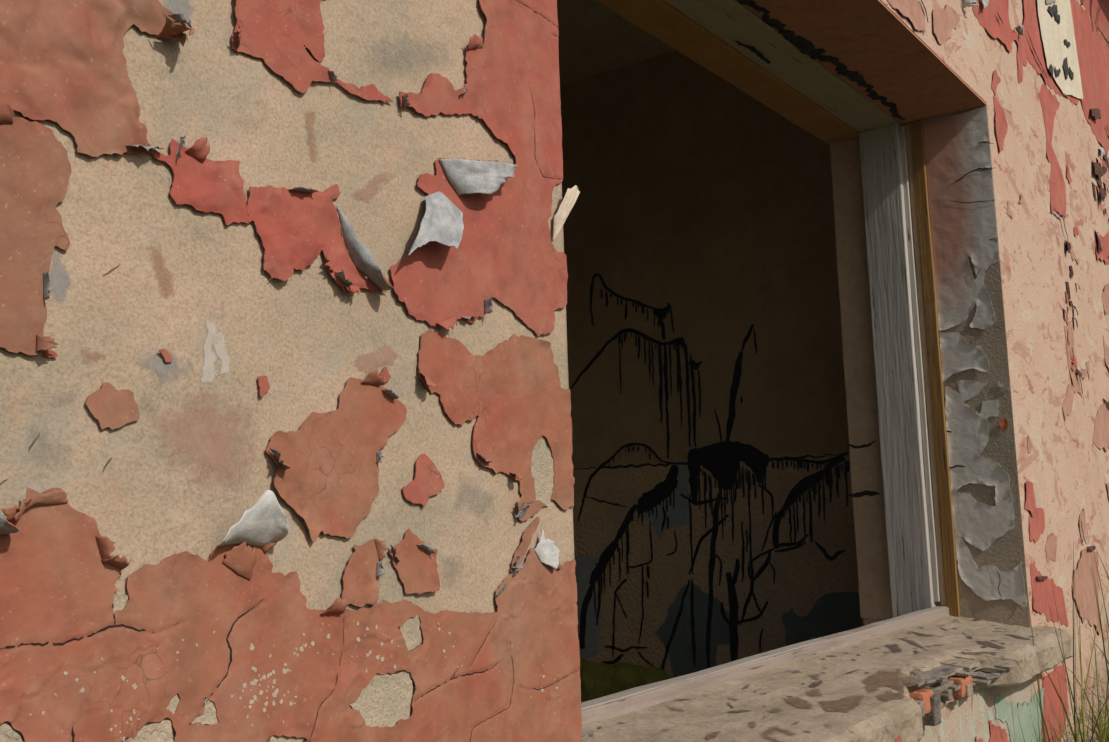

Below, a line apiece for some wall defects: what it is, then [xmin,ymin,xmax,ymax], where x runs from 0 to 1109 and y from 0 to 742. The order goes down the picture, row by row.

peeling [887,0,1109,219]
peeling [1094,230,1109,265]
peeling [0,0,602,742]
peeling [923,69,1101,635]
peeling [1093,399,1109,452]
crack [0,614,146,649]
crack [203,599,263,707]
crack [311,628,344,737]
crack [415,620,577,741]
spalling [909,657,1069,742]